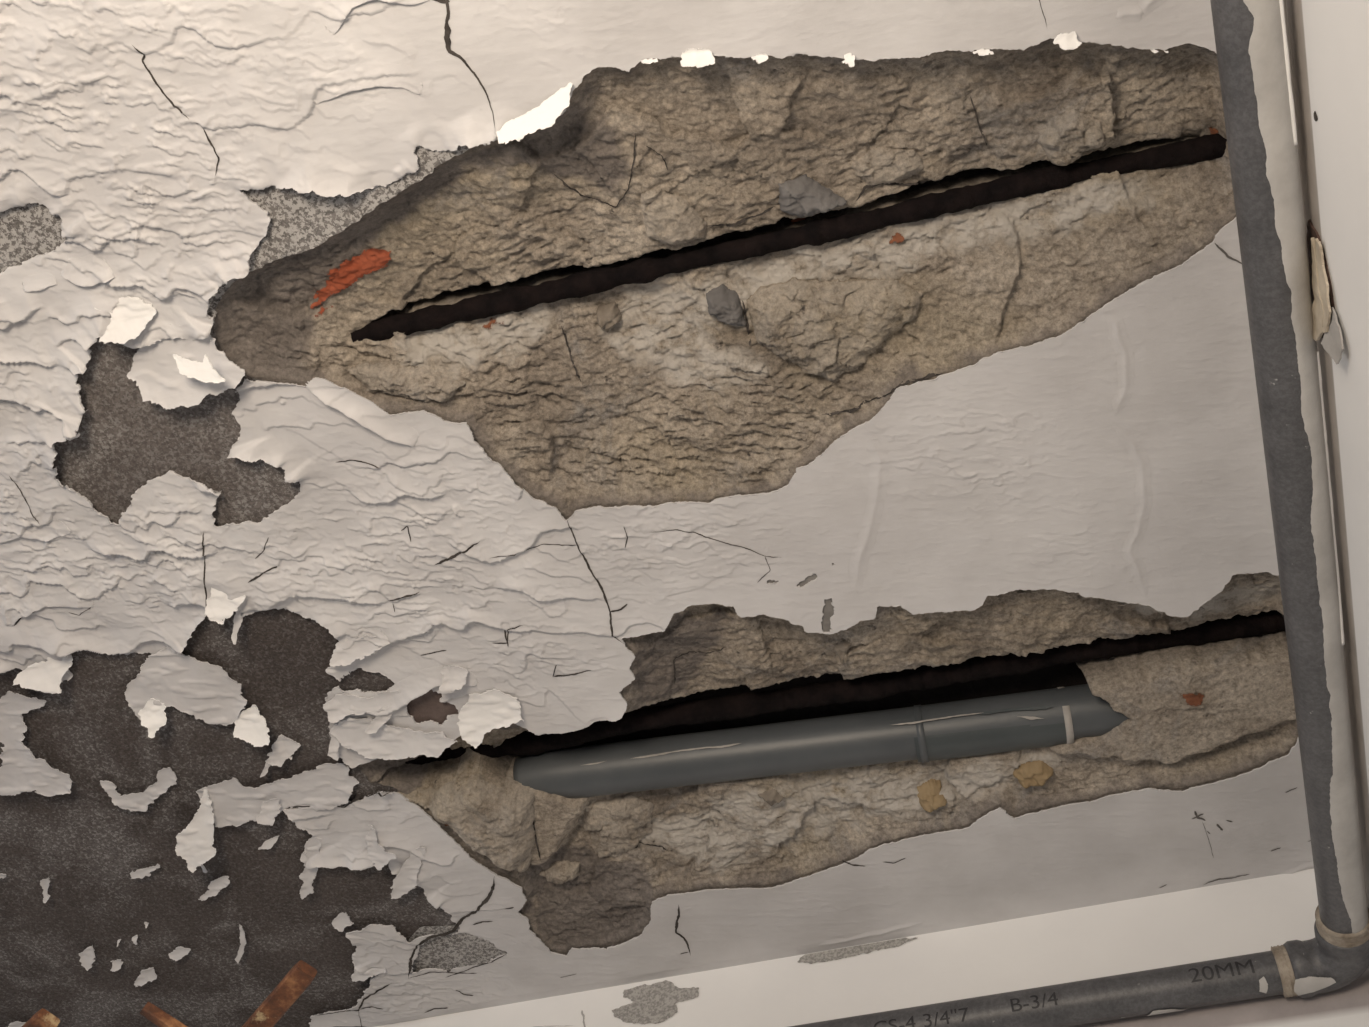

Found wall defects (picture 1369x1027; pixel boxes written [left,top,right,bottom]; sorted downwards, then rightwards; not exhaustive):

peeling [318,0,428,35]
crack [434,0,495,126]
peeling [0,203,116,292]
corrosion [310,248,391,317]
spalling [53,31,1236,526]
peeling [1307,219,1344,364]
peeling [0,517,72,543]
crack [388,521,627,646]
spalling [0,572,1298,1027]